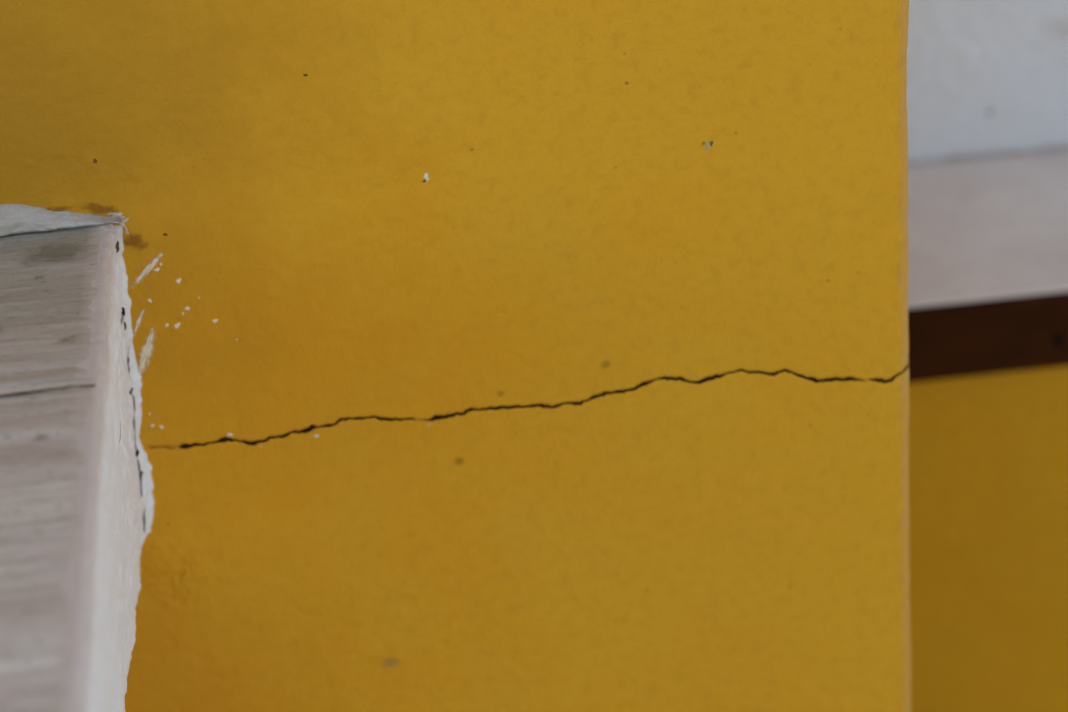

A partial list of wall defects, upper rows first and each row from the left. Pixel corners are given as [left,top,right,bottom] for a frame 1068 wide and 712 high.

crack [0,384,96,396]
crack [120,307,910,533]